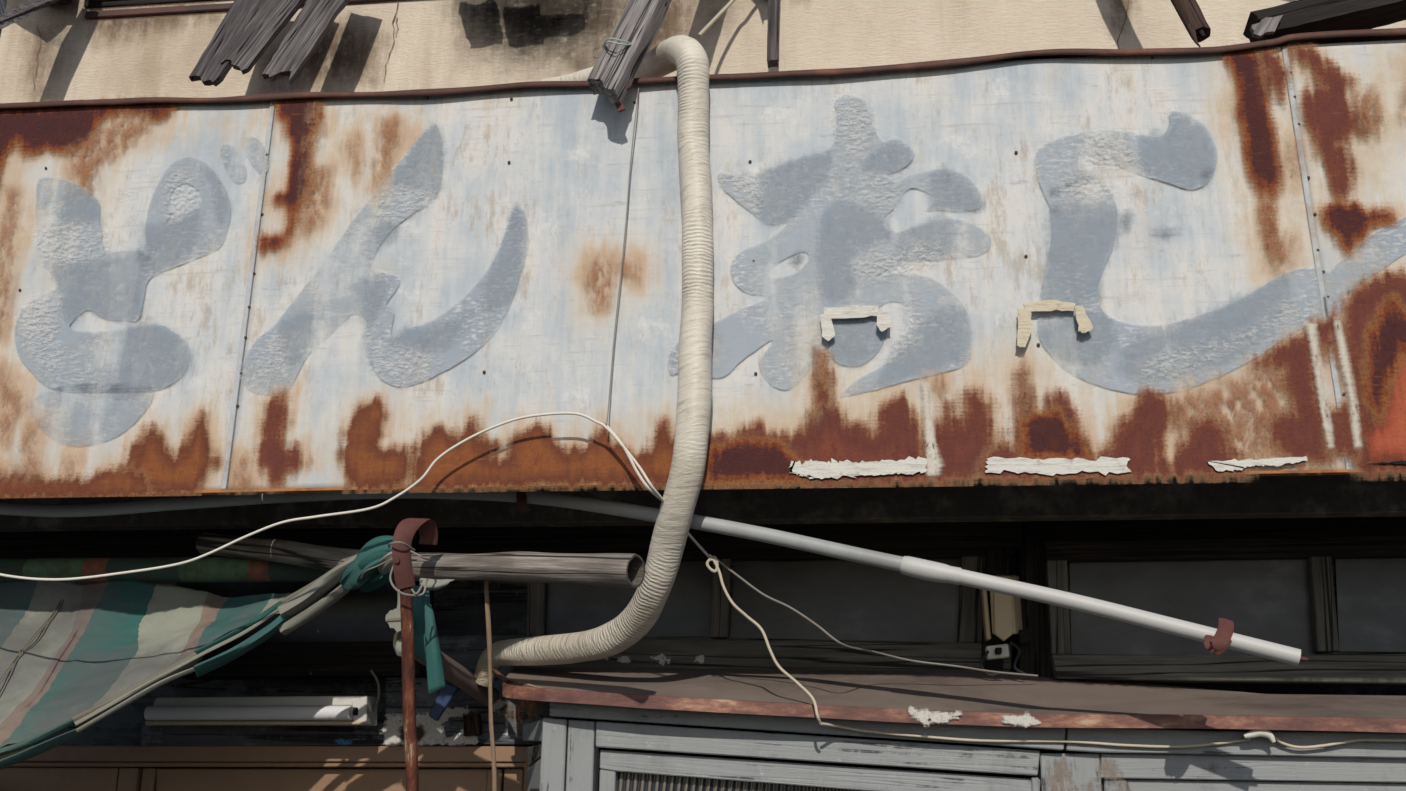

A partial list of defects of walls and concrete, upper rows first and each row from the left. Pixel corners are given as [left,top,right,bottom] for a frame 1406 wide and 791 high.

water stain [470,0,629,67]
water stain [648,0,690,51]
crack [1117,0,1129,49]
rust [0,103,177,193]
rust [256,98,329,254]
rust [1223,42,1397,265]
rust [587,260,637,303]
rust [700,267,1406,490]
rust [0,378,303,498]
rust [336,394,675,494]
peeling [908,707,962,727]
peeling [1001,713,1041,727]